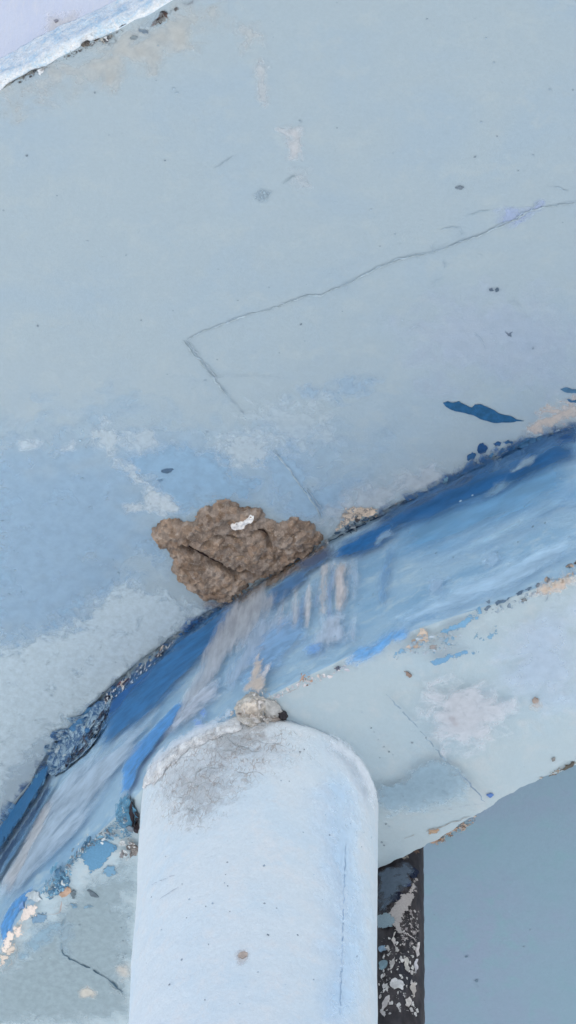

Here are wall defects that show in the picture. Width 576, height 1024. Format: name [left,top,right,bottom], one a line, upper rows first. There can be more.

spalling [4,1,193,88]
crack [184,187,574,417]
crack [274,429,573,542]
peeling [333,435,544,537]
leakage [100,399,576,792]
leakage [0,763,49,825]
peeling [0,579,208,1023]
crack [386,694,494,812]
spalling [426,816,477,845]
crack [60,917,126,999]
peeling [377,850,420,1017]